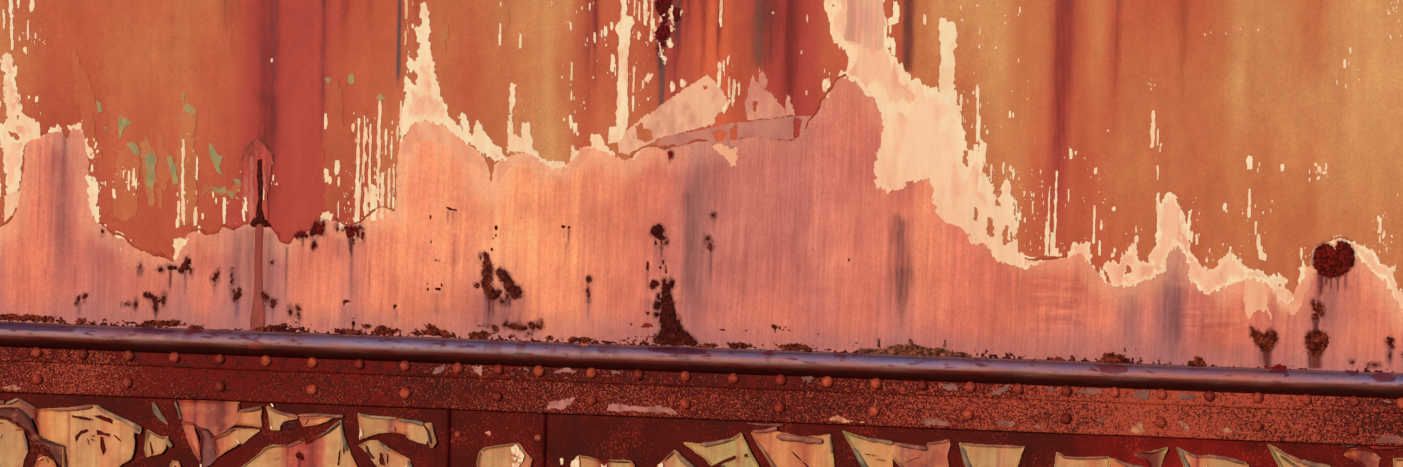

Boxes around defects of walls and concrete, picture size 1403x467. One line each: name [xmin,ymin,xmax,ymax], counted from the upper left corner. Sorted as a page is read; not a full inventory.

rust [649,0,720,65]
peeling [0,0,1403,373]
rust [294,220,364,252]
rust [334,225,593,343]
rust [630,224,752,349]
rust [1305,241,1355,368]
rust [1249,326,1291,369]
peeling [0,385,437,467]
peeling [476,431,533,467]
peeling [560,455,635,467]
peeling [657,415,1024,467]
peeling [1054,420,1249,467]